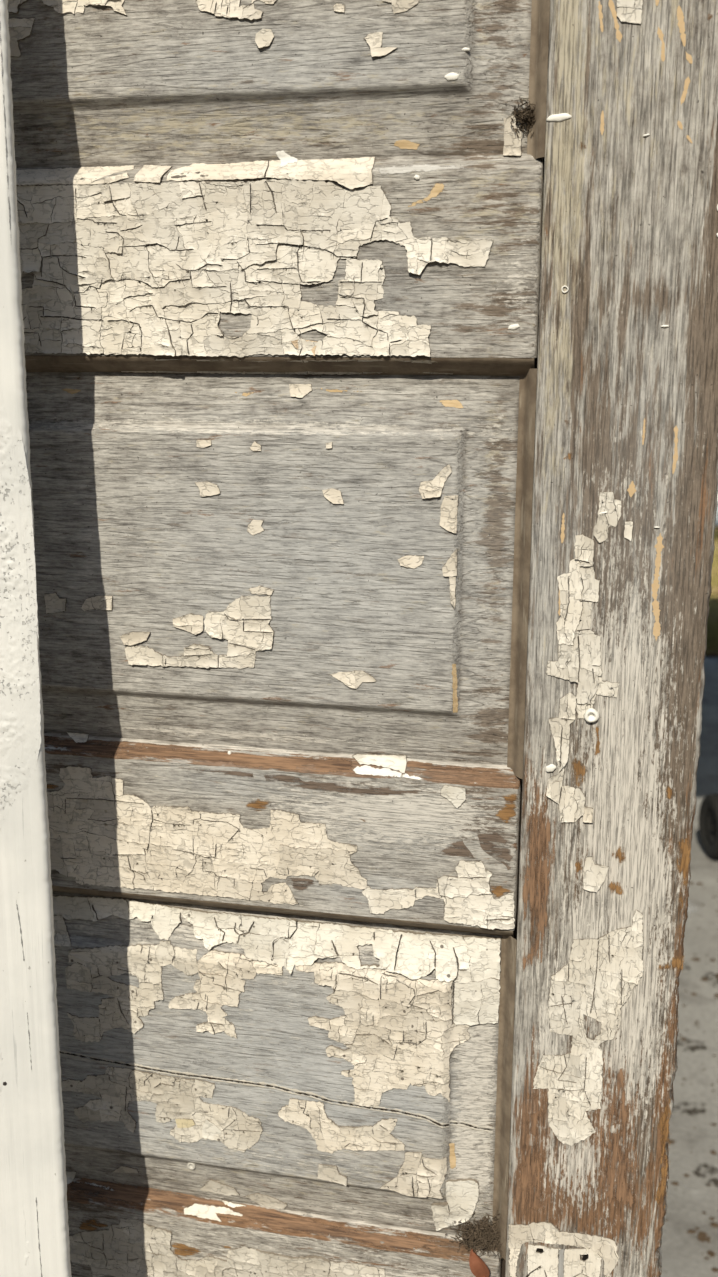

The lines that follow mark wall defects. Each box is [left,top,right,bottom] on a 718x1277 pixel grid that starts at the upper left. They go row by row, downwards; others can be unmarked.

peeling [8,0,127,57]
peeling [196,0,277,49]
peeling [364,32,397,58]
peeling [382,0,419,14]
peeling [16,157,493,398]
peeling [322,488,344,504]
peeling [419,464,459,533]
peeling [44,492,633,1231]
peeling [659,956,684,971]
peeling [508,910,644,1277]
peeling [655,1099,671,1209]
peeling [69,1218,385,1277]